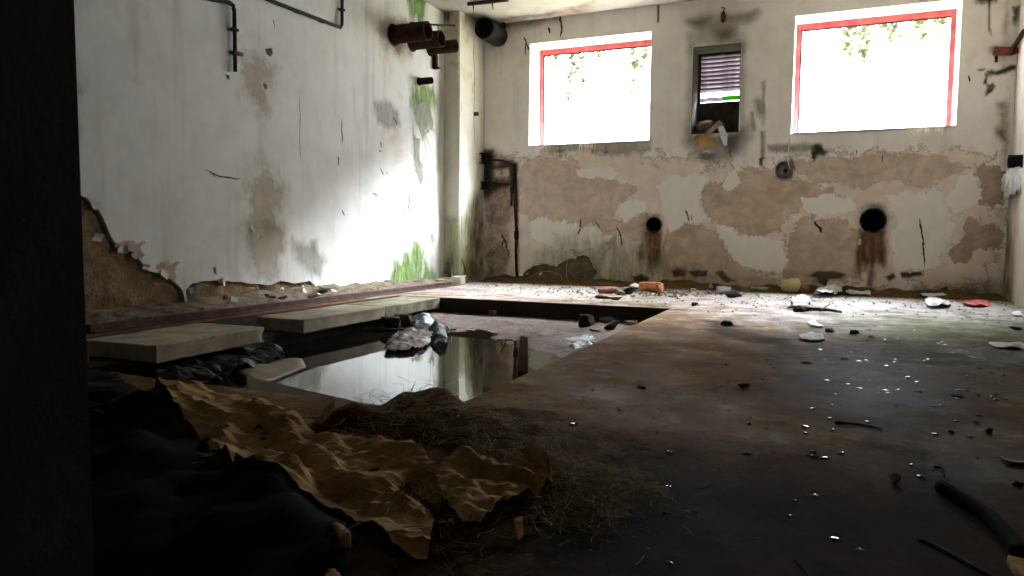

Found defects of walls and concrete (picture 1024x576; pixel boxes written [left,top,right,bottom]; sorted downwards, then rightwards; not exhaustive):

crack [206,169,241,180]
peeling [484,143,1007,291]
flaking render [81,197,315,310]
damp [394,242,418,277]
corrosion [640,233,661,265]
corrosion [857,228,885,285]
crack [918,218,926,267]